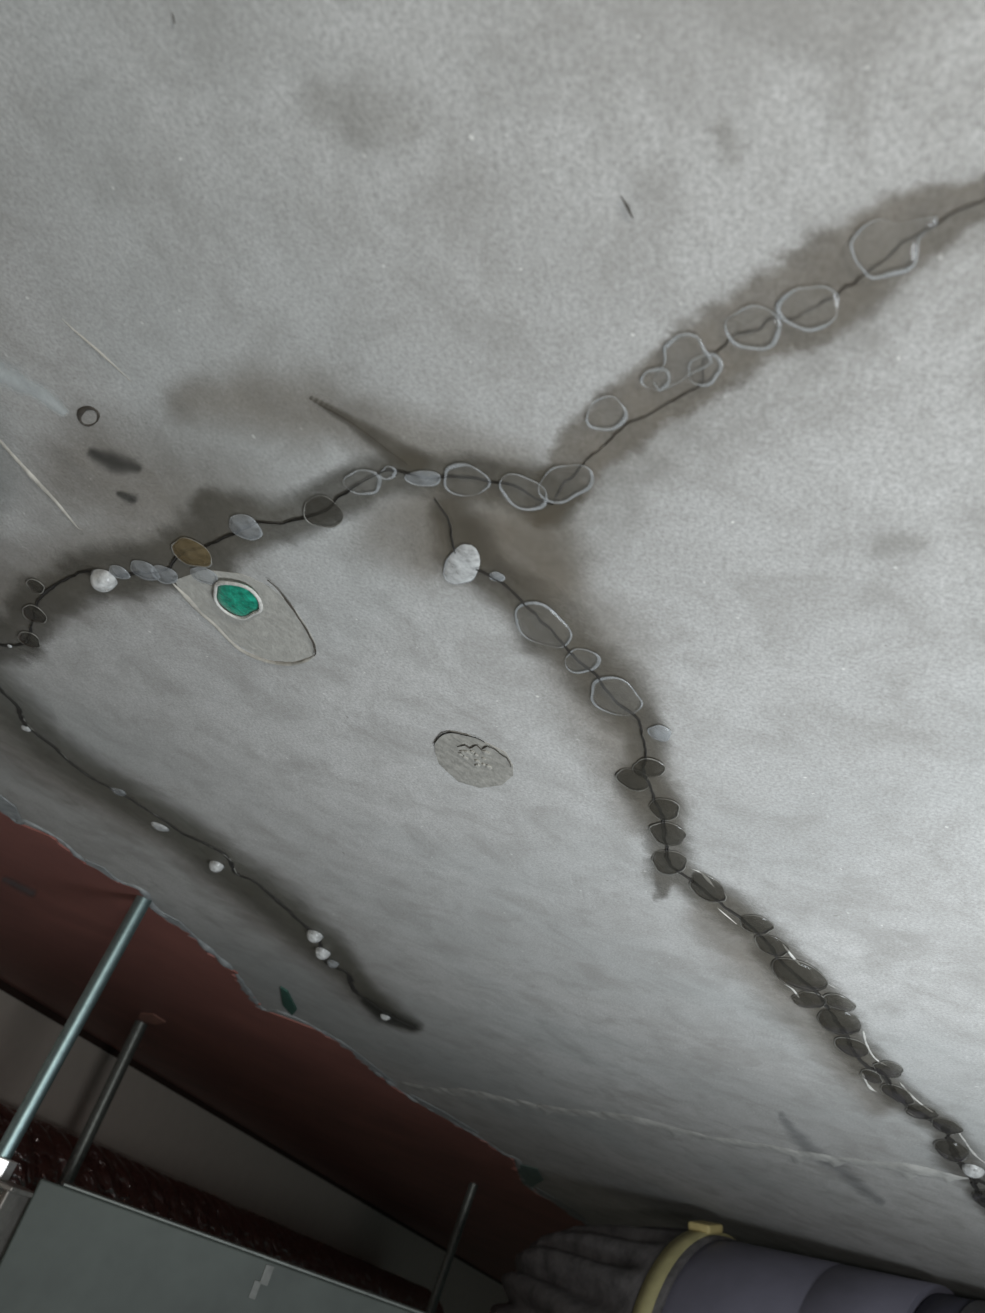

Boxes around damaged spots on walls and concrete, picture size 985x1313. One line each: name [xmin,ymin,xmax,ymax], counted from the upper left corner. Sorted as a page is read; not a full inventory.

peeling [280,986,297,1015]
spalling [433,730,513,788]
leakage [0,181,985,1205]
crack [0,200,985,1203]